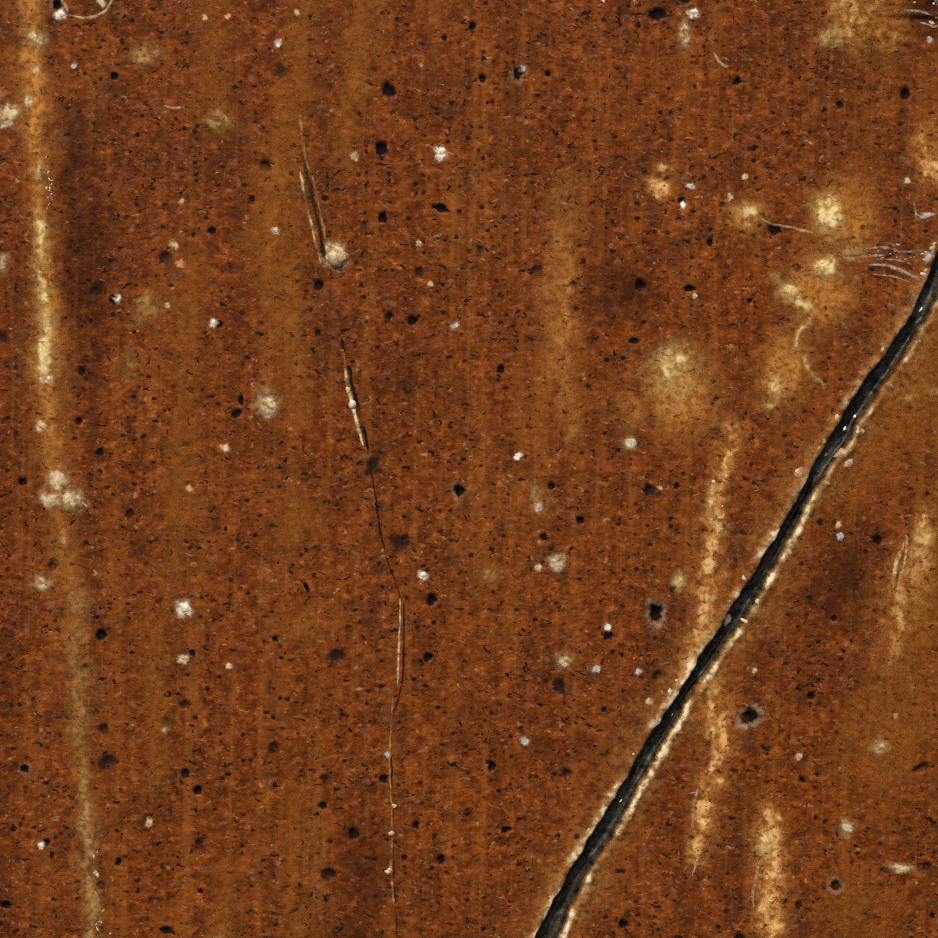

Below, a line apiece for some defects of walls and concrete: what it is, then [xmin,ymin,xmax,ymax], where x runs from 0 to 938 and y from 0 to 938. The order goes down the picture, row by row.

damp [0,0,60,445]
crack [299,115,326,261]
damp [649,178,670,199]
damp [735,206,757,228]
damp [784,185,935,320]
damp [657,352,705,422]
damp [762,326,809,398]
damp [41,471,87,508]
crack [345,366,405,713]
crack [533,242,938,938]
damp [80,771,111,938]
crack [384,738,397,933]